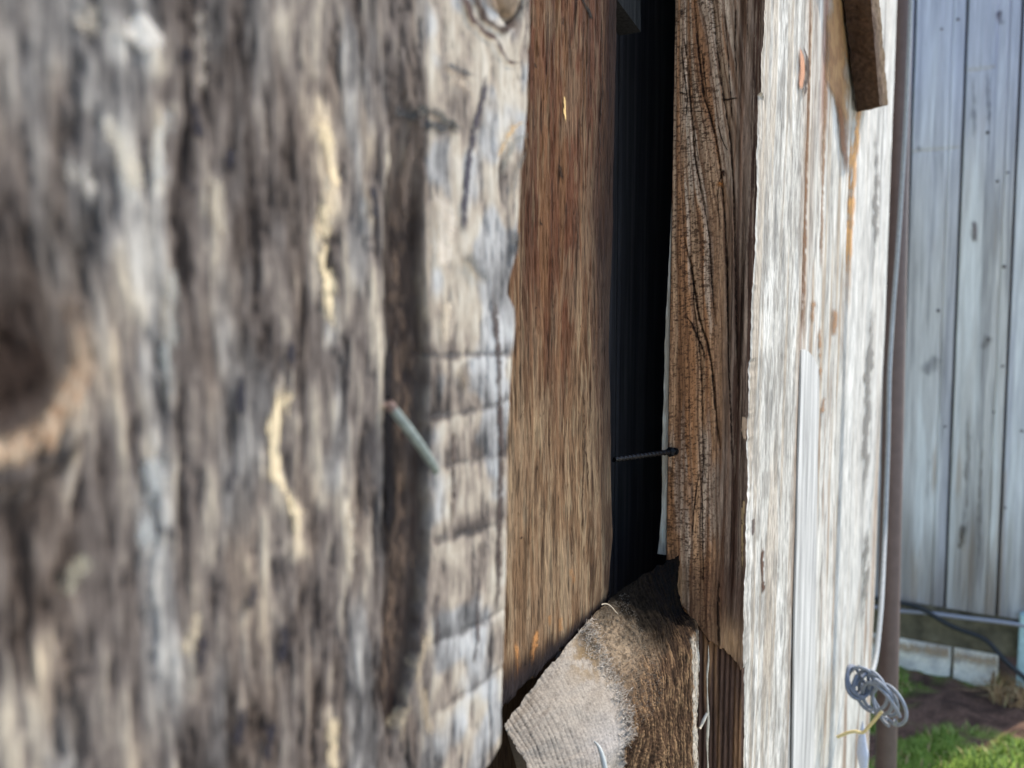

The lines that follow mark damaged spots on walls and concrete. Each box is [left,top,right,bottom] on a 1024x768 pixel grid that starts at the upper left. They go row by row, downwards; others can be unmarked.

crack [675,10,738,662]
corrosion [846,112,861,272]